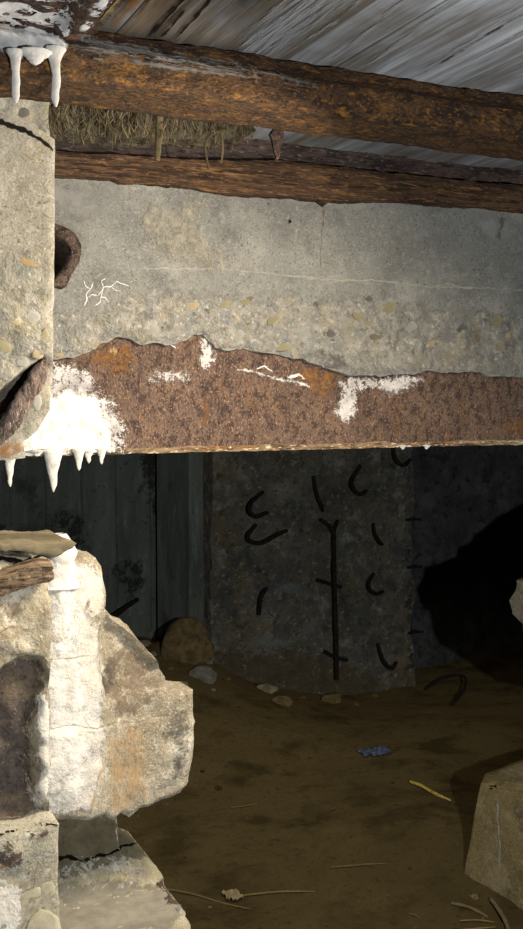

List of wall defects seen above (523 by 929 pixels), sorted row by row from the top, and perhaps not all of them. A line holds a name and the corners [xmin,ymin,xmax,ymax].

leakage [0,0,316,107]
leakage [242,0,362,56]
leakage [5,362,129,492]
leakage [333,374,422,424]
crack [0,823,58,835]
crack [18,843,136,929]